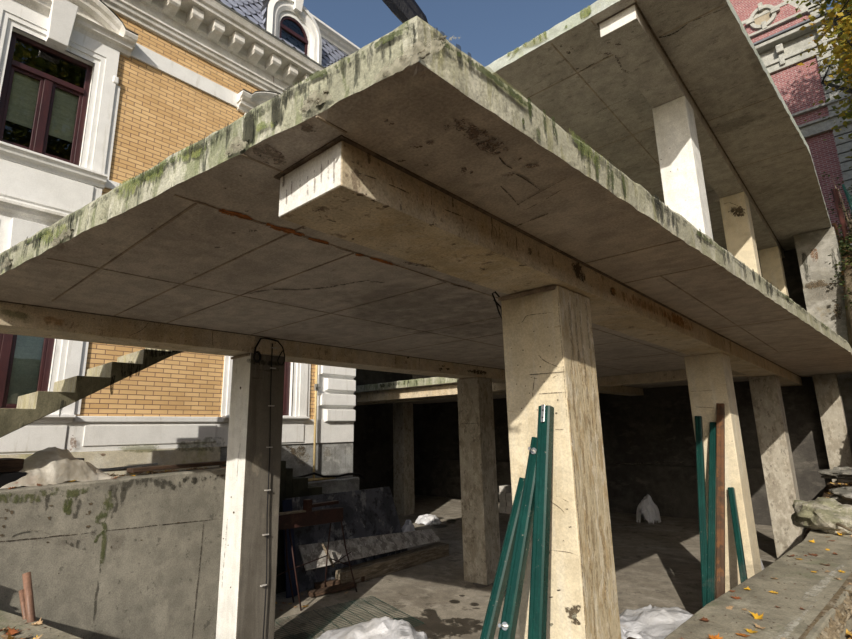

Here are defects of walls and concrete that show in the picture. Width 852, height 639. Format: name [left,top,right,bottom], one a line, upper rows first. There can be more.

water stain [433,28,472,72]
water stain [271,81,300,124]
water stain [243,106,286,165]
water stain [282,158,335,202]
water stain [444,119,564,209]
corrosion [195,200,472,289]
water stain [0,488,88,519]
water stain [109,476,206,518]
spalling [565,605,581,625]